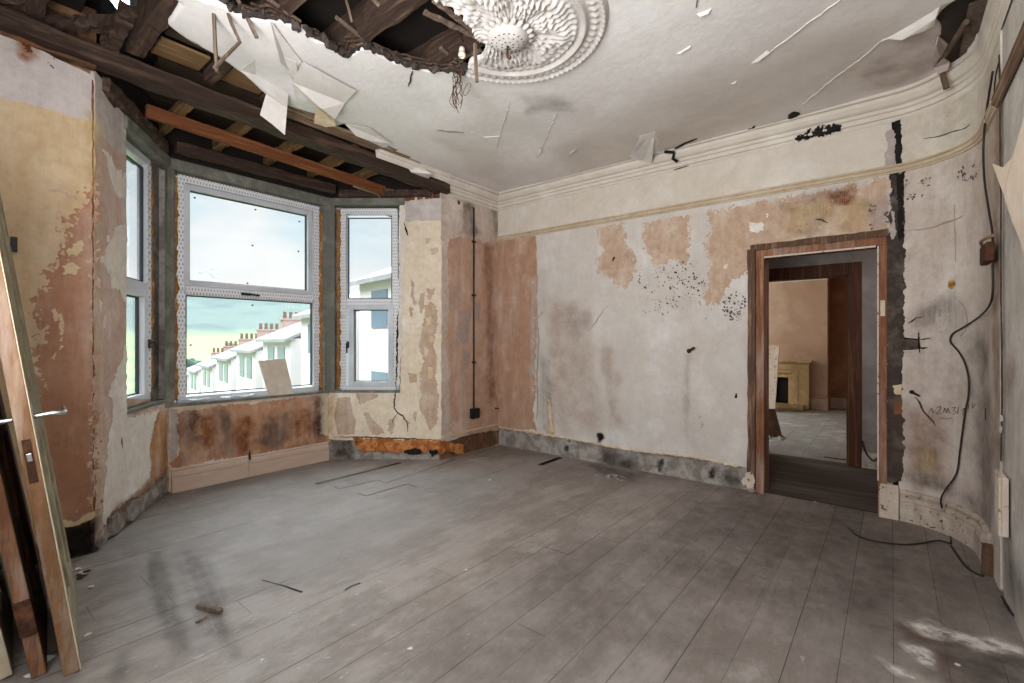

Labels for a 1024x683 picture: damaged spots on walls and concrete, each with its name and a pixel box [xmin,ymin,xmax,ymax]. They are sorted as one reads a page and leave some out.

spalling [219,0,468,76]
peeling [102,149,127,198]
peeling [594,129,897,306]
water stain [638,261,705,315]
water stain [722,291,746,321]
peeling [24,183,395,549]
crack [341,313,438,440]